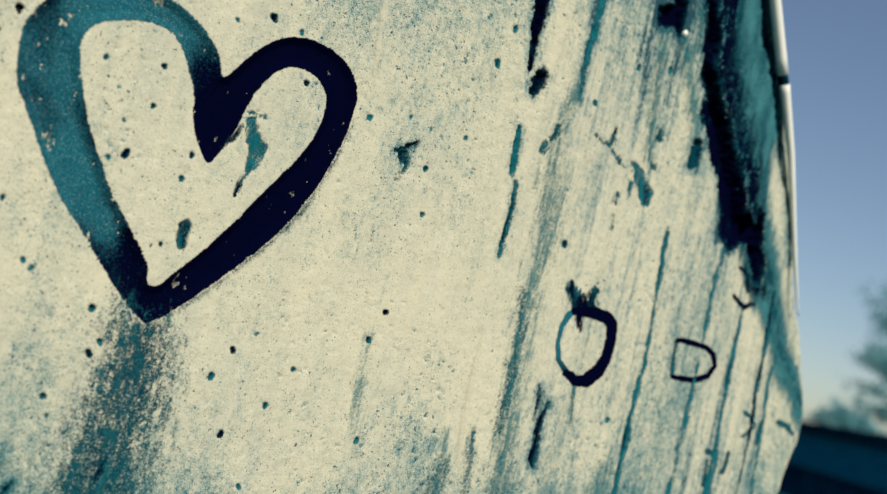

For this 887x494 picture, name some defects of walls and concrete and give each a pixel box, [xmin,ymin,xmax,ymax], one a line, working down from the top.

leakage [644,0,803,431]